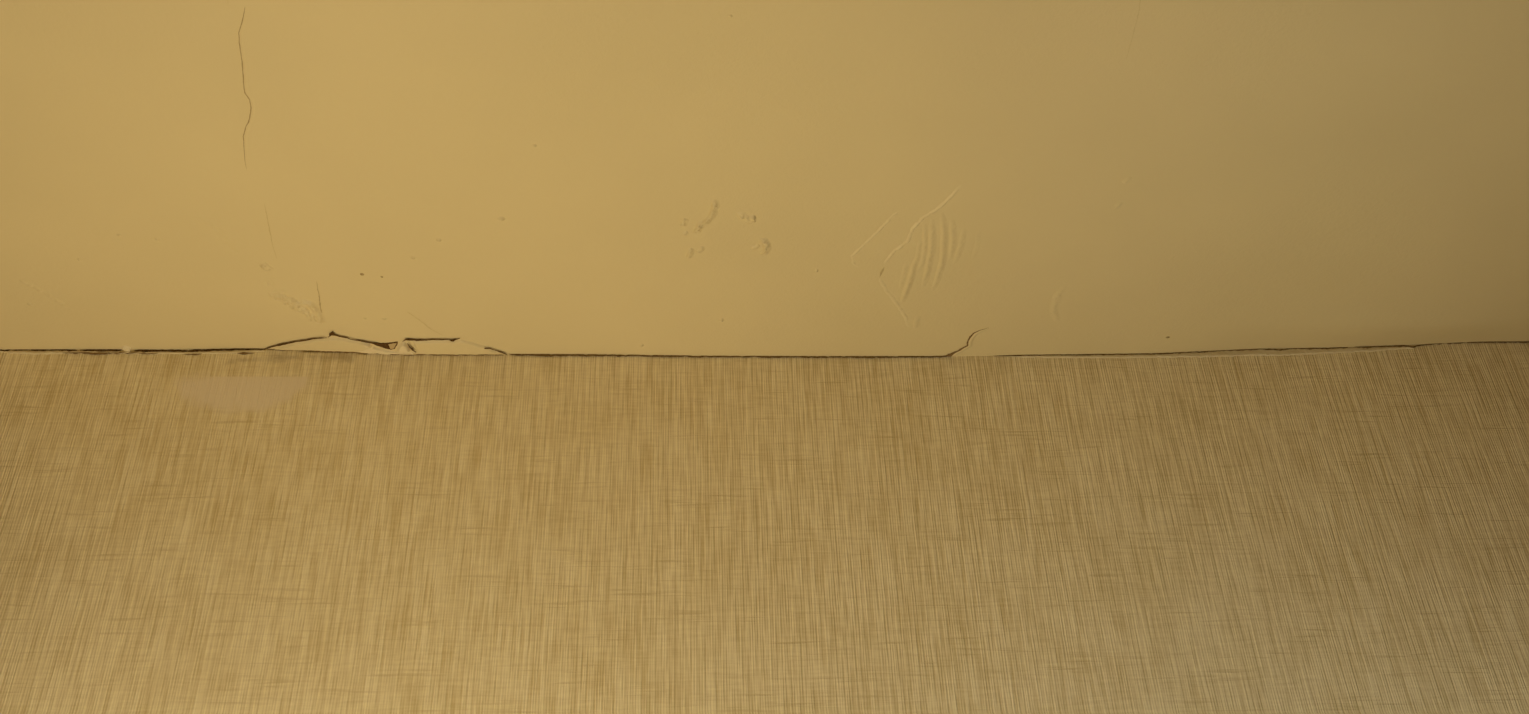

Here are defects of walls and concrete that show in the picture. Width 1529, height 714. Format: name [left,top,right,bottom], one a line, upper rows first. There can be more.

crack [227,0,255,169]
crack [0,328,1529,358]